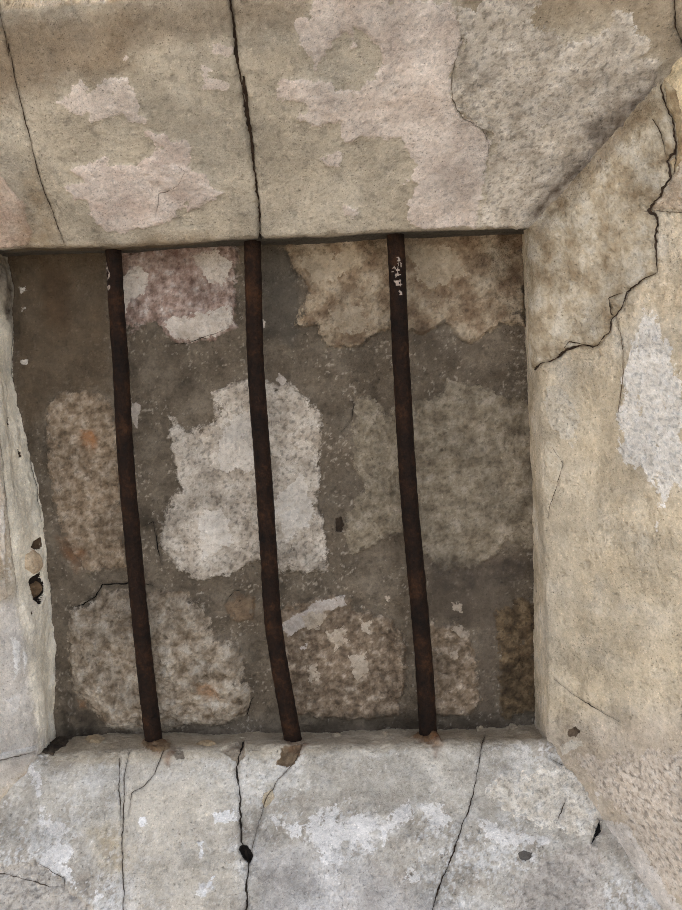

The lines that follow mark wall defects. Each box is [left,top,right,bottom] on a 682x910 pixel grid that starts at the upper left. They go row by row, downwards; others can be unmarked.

crack [229,0,261,237]
peeling [272,0,666,298]
crack [534,85,682,422]
peeling [131,394,144,433]
peeling [190,502,239,564]
peeling [210,405,255,479]
peeling [267,399,276,450]
peeling [273,470,320,548]
crack [118,750,164,910]
crack [236,741,303,910]
rust [277,737,314,760]
crack [432,737,485,910]